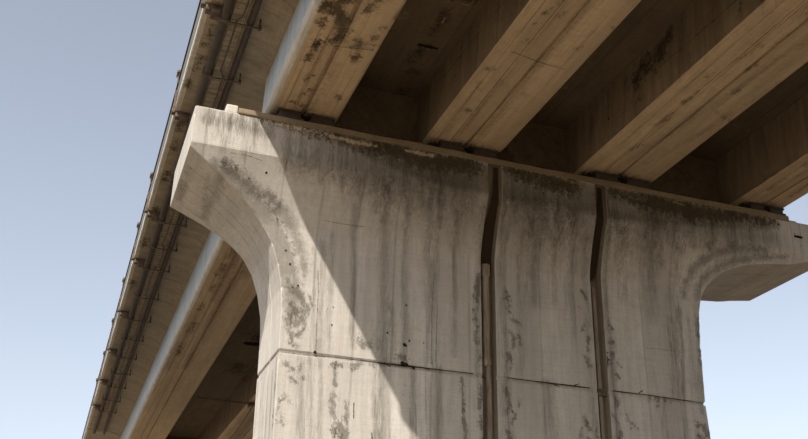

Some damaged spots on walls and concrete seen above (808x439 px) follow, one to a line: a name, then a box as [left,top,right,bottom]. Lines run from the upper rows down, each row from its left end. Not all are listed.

leakage [260,109,489,181]